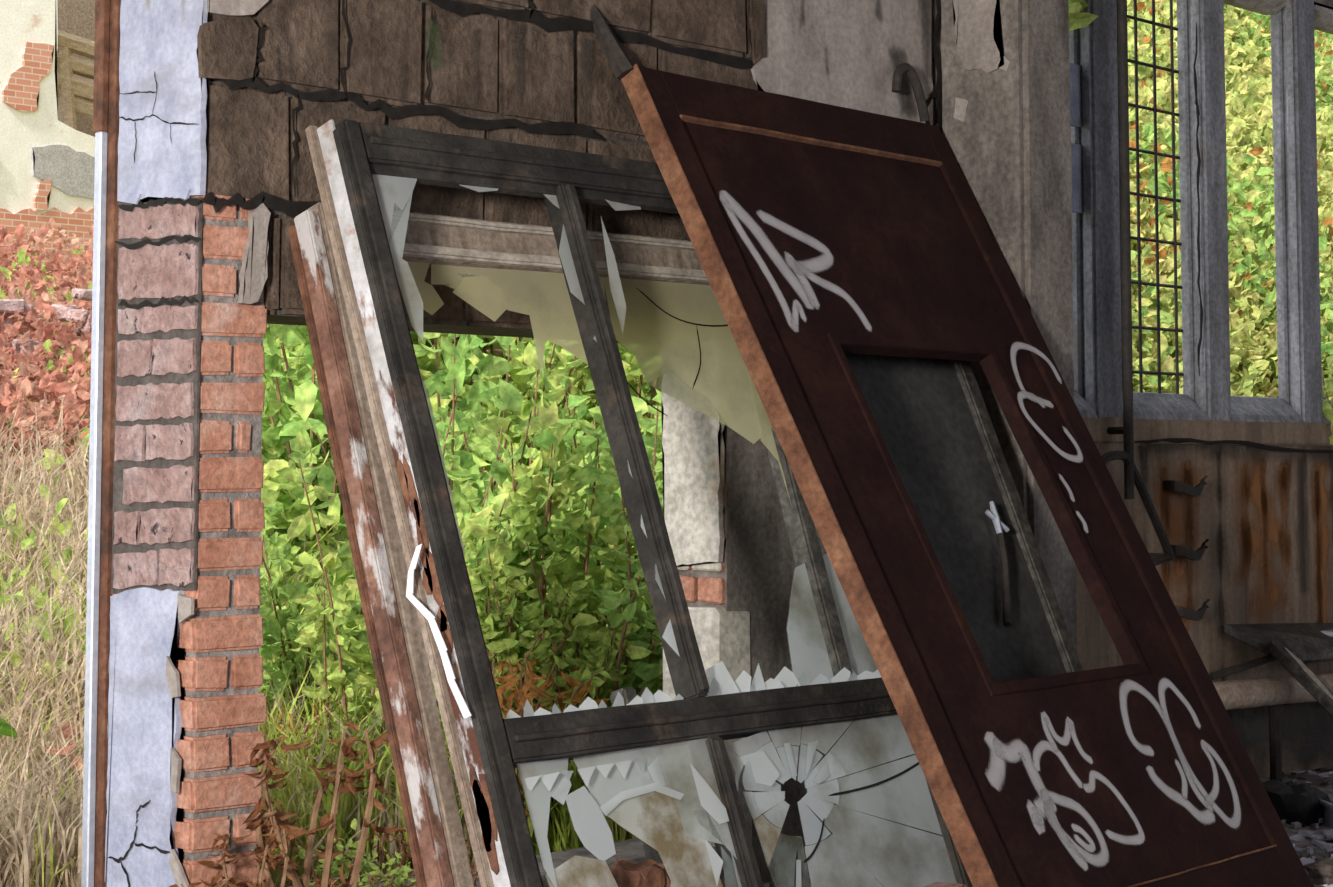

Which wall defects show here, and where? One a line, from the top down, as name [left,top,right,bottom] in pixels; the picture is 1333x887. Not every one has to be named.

crack [115,0,753,250]
crack [118,295,197,310]
spalling [105,0,271,887]
rust [1159,462,1197,626]
rust [1240,458,1290,620]
rust [1313,461,1329,623]
crack [108,800,170,887]